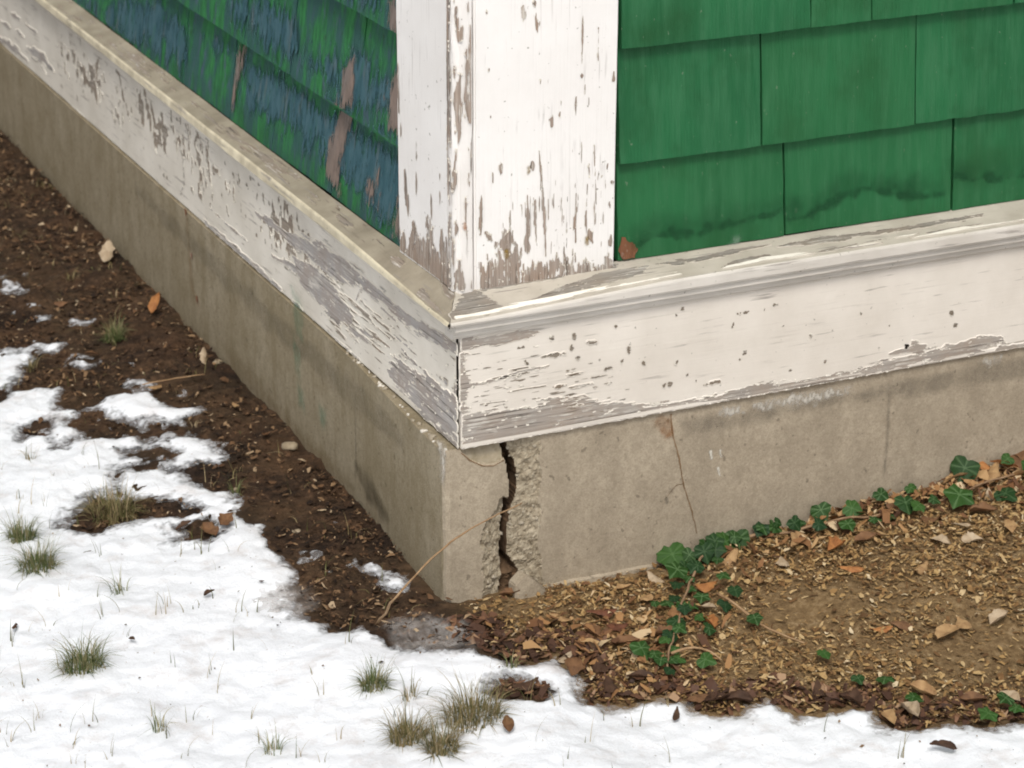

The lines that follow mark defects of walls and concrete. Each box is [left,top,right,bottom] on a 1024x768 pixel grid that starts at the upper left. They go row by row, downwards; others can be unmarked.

peeling [0,0,1024,597]
crack [498,442,518,590]
crack [666,414,697,533]